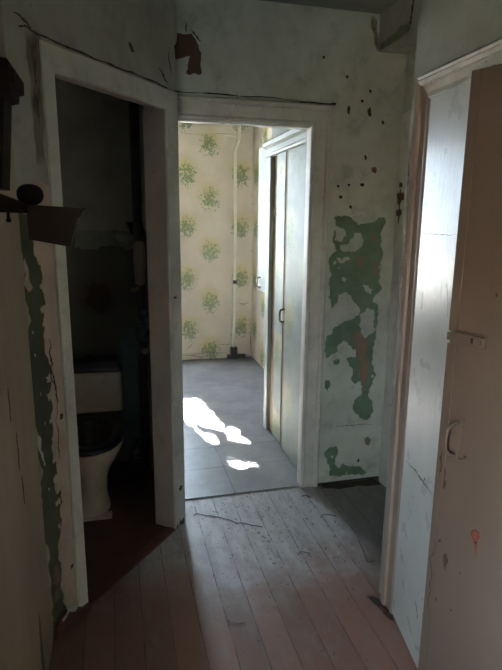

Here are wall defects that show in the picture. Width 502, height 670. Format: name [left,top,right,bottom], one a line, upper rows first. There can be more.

crack [13,12,335,107]
peeling [33,178,50,206]
corrosion [396,182,404,223]
peeling [324,205,386,420]
peeling [18,213,92,641]
peeling [324,446,367,477]
crack [406,453,442,495]